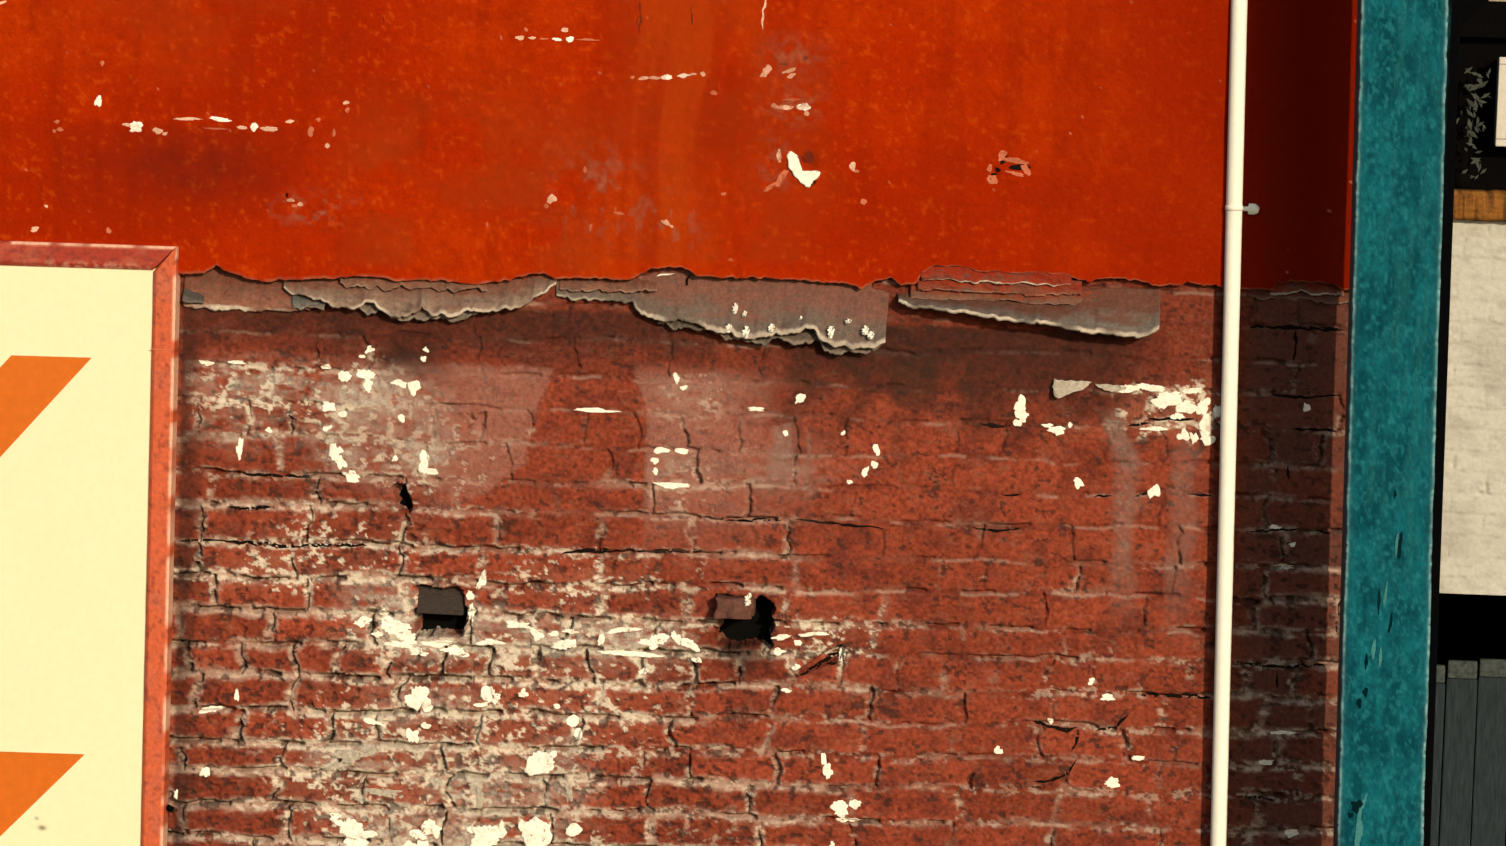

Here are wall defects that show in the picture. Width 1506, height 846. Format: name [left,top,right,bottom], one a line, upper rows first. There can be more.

peeling [122,116,336,148]
spalling [764,149,820,192]
flaking render [182,267,1161,356]
peeling [320,345,421,397]
peeling [322,401,360,483]
peeling [1052,379,1221,446]
peeling [353,569,579,657]
peeling [597,627,702,674]
spalling [714,593,846,671]
peeling [404,686,433,743]
peeling [466,780,582,846]
peeling [830,799,861,822]